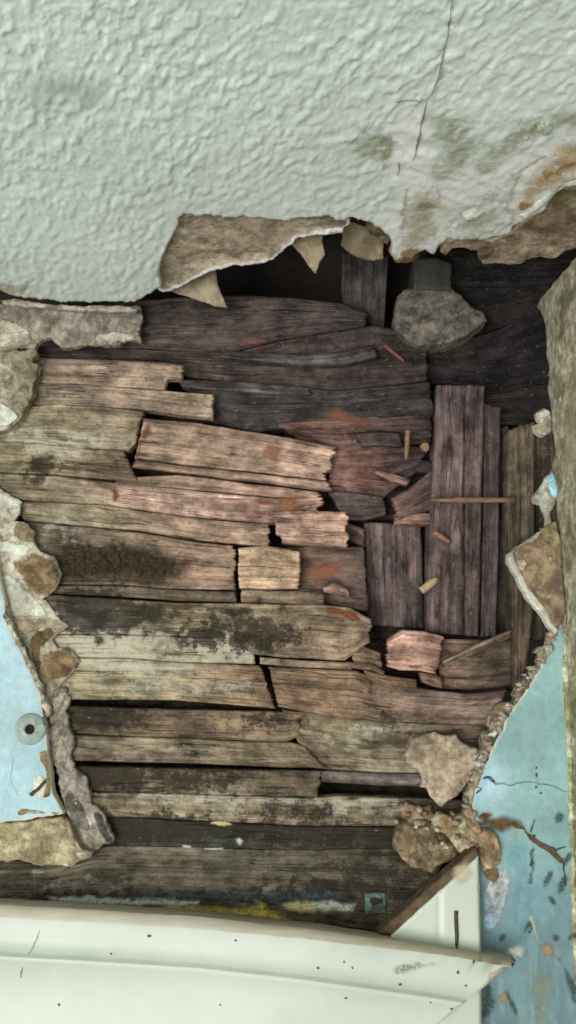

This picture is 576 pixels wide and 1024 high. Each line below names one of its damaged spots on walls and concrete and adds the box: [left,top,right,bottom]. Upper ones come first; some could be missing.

crack [396,0,453,176]
leakage [478,113,576,174]
leakage [401,197,441,258]
spalling [439,172,576,264]
spalling [0,214,428,347]
peeling [0,402,19,427]
leakage [52,542,180,586]
spalling [0,489,116,867]
spalling [403,470,576,997]
crack [476,776,566,794]
leakage [529,848,572,905]
leakage [482,986,495,1018]